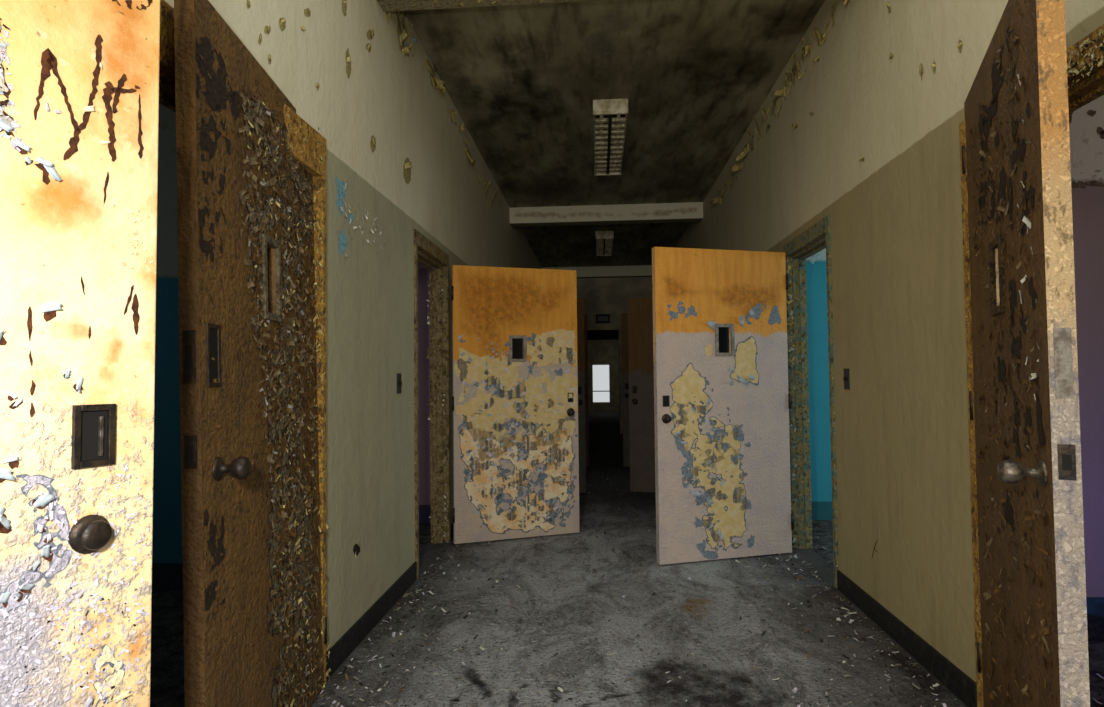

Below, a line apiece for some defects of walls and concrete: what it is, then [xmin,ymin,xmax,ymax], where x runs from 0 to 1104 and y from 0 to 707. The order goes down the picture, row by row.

peeling [0,18,62,185]
peeling [112,0,153,14]
peeling [258,18,286,64]
peeling [8,392,23,409]
peeling [41,302,62,322]
peeling [63,369,83,392]
peeling [196,34,331,707]
peeling [427,329,578,538]
peeling [667,301,718,331]
peeling [670,363,755,560]
peeling [728,259,794,386]
peeling [0,456,150,707]